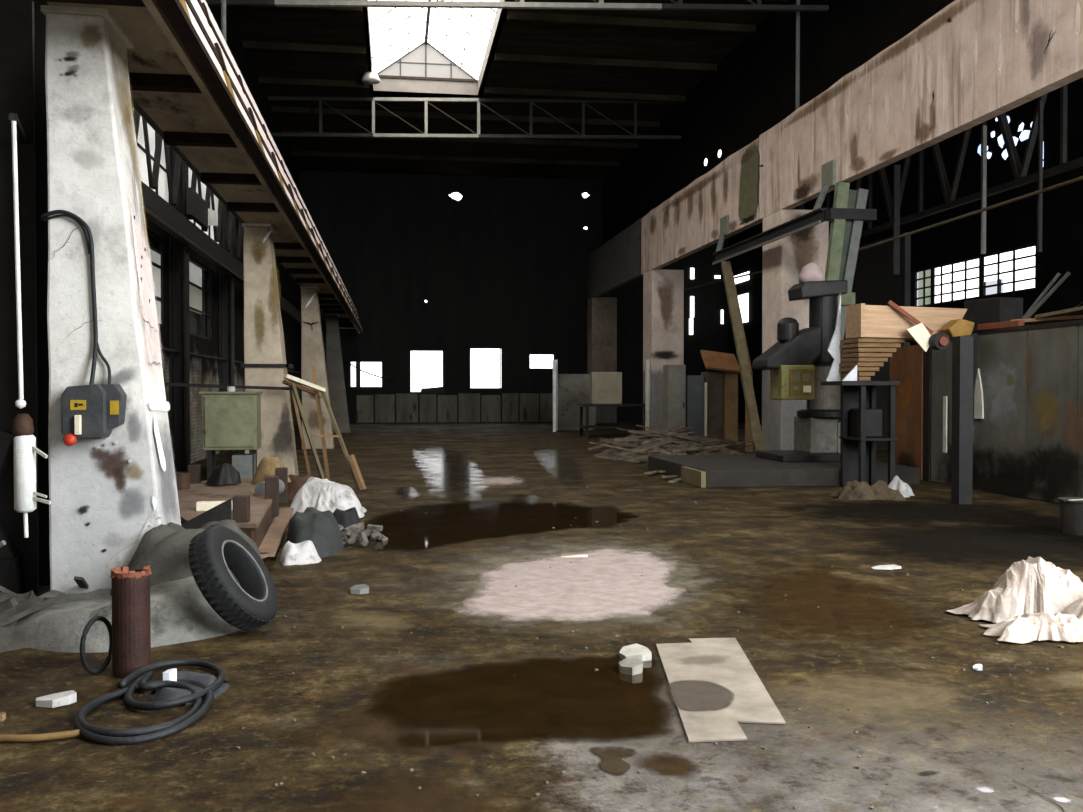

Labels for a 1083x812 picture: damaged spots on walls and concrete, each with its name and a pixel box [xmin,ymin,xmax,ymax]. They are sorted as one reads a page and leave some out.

damp [1015,0,1046,73]
rust [92,441,141,489]